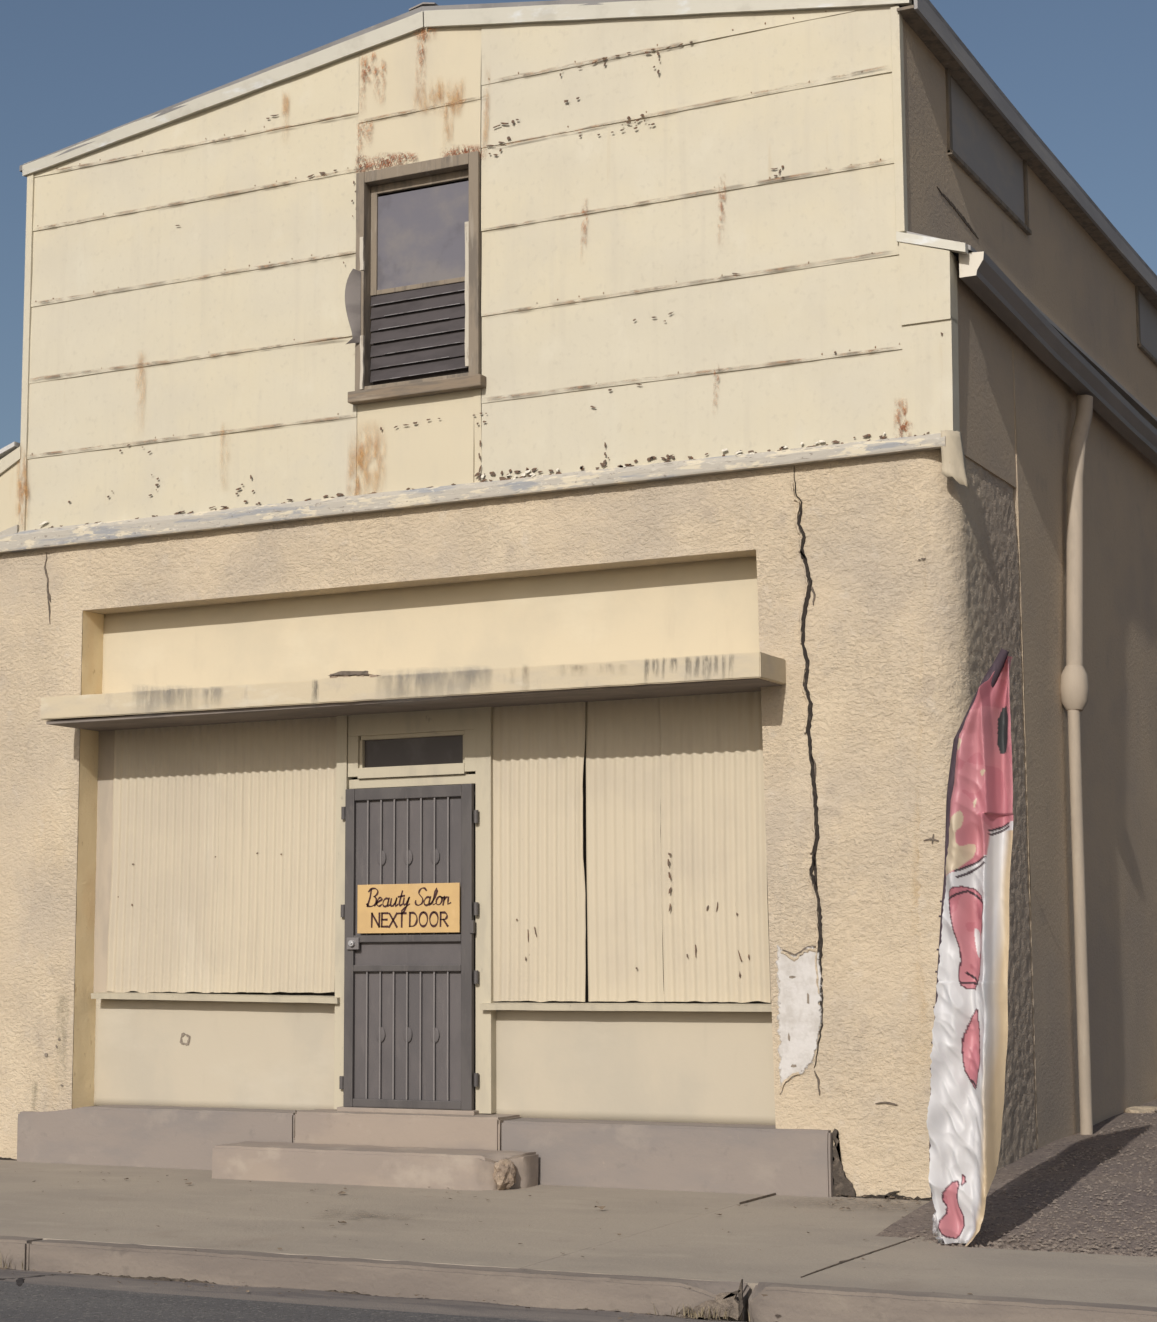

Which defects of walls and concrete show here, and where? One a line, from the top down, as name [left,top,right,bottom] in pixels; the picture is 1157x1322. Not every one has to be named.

rust [357,154,416,170]
peeling [473,412,562,482]
peeling [580,432,887,470]
crack [43,553,51,623]
crack [783,466,824,1096]
spalling [776,946,822,1094]
spalling [493,1159,516,1190]
crack [575,1279,744,1321]